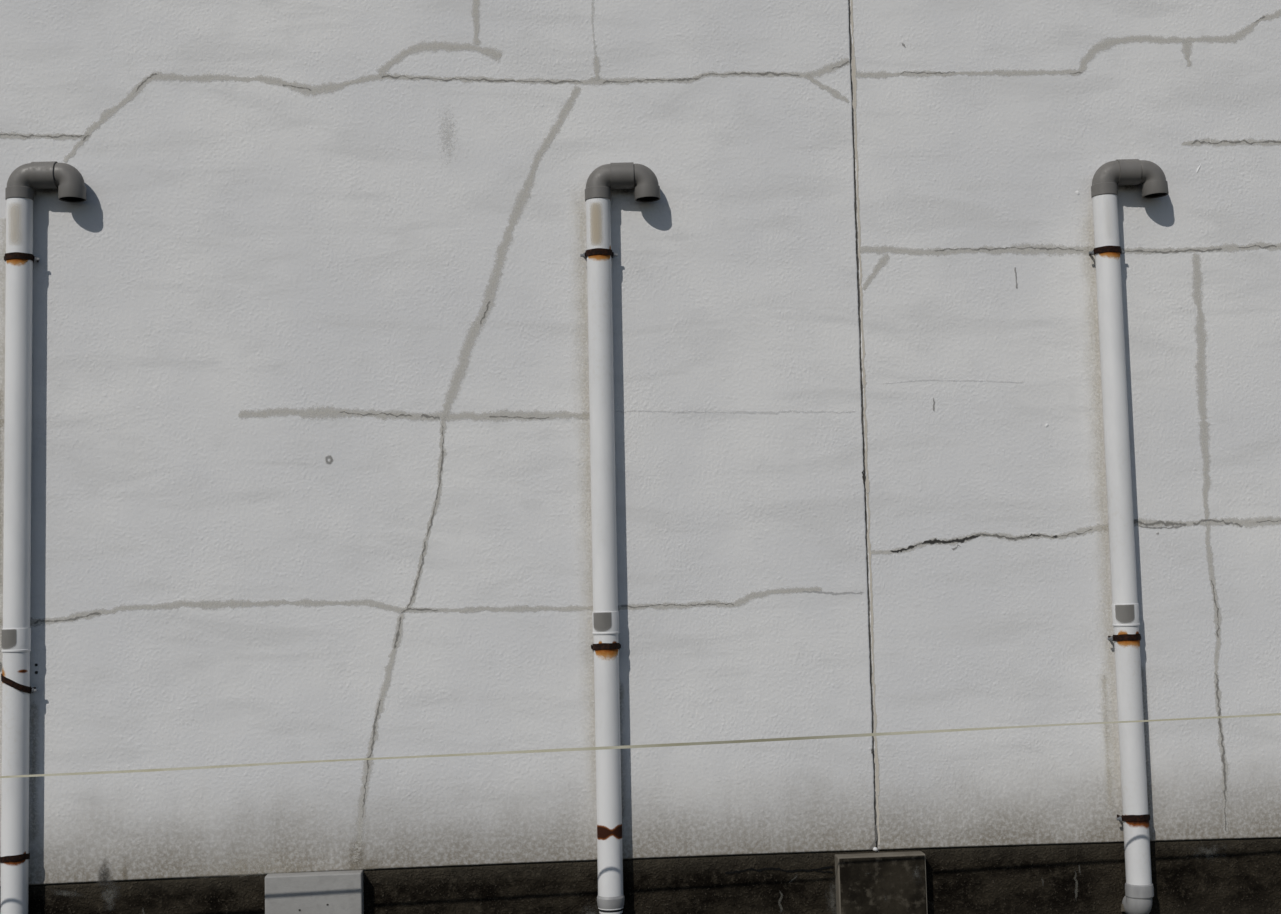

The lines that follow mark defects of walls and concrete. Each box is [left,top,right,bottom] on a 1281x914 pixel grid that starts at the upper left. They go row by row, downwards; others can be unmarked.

crack [0,0,849,862]
crack [856,10,1281,78]
crack [860,242,1281,834]
crack [1182,138,1281,146]